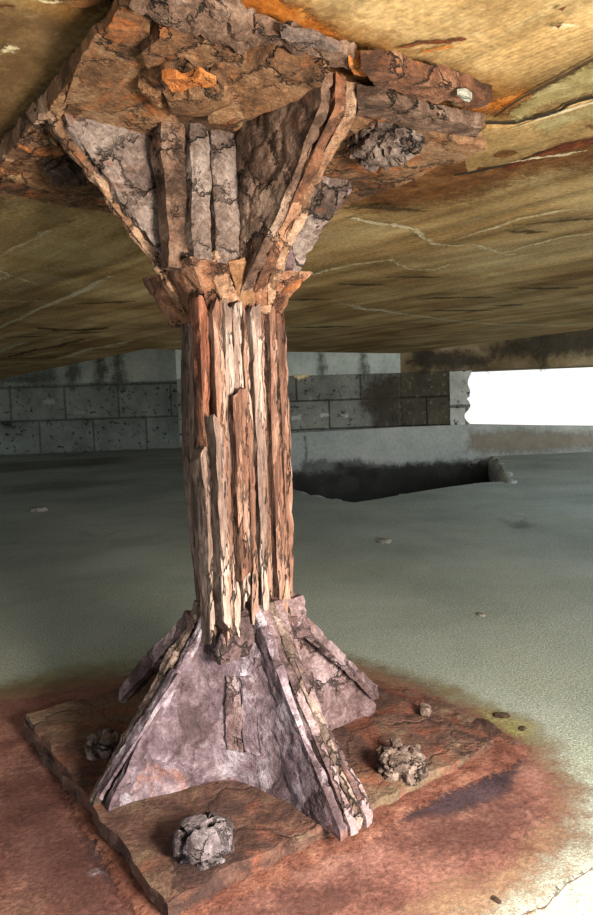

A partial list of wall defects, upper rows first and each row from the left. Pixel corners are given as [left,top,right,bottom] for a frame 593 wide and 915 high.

corrosion [399,38,466,54]
peeling [451,88,472,105]
crack [485,58,593,125]
crack [454,138,593,176]
crack [8,327,133,360]
damp [407,325,593,375]
corrosion [0,0,392,812]
damp [360,353,402,428]
corrosion [179,49,593,915]
corrosion [0,610,194,915]
crack [517,869,593,915]